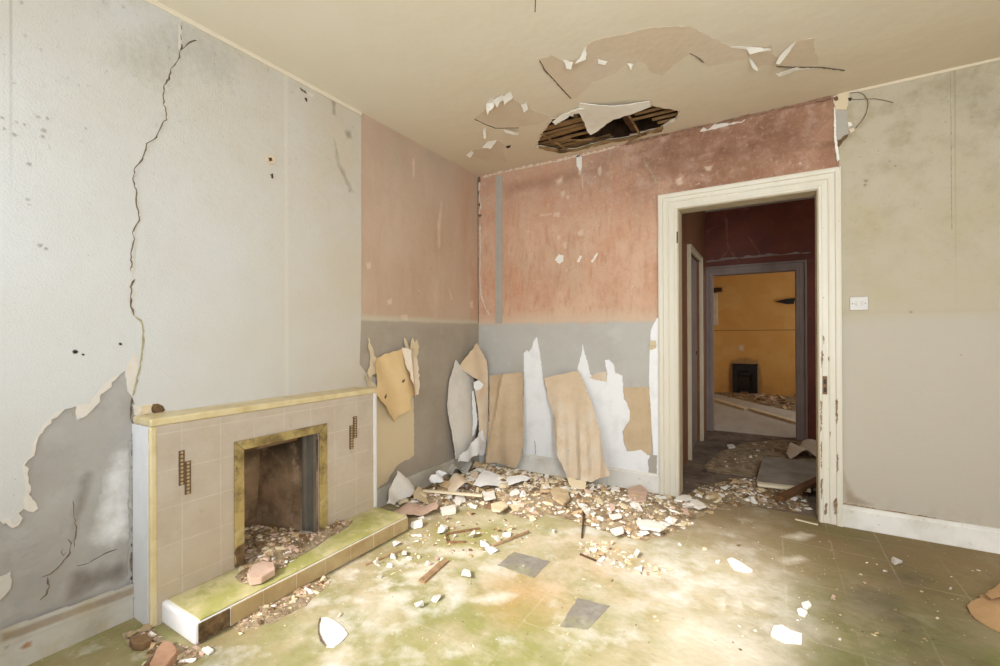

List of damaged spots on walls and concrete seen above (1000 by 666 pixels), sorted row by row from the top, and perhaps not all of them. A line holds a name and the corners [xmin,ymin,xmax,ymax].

peeling [466,92,663,162]
peeling [539,26,845,99]
spalling [833,92,855,161]
crack [40,19,197,600]
peeling [648,318,659,474]
peeling [0,354,165,630]
damp [53,437,132,611]